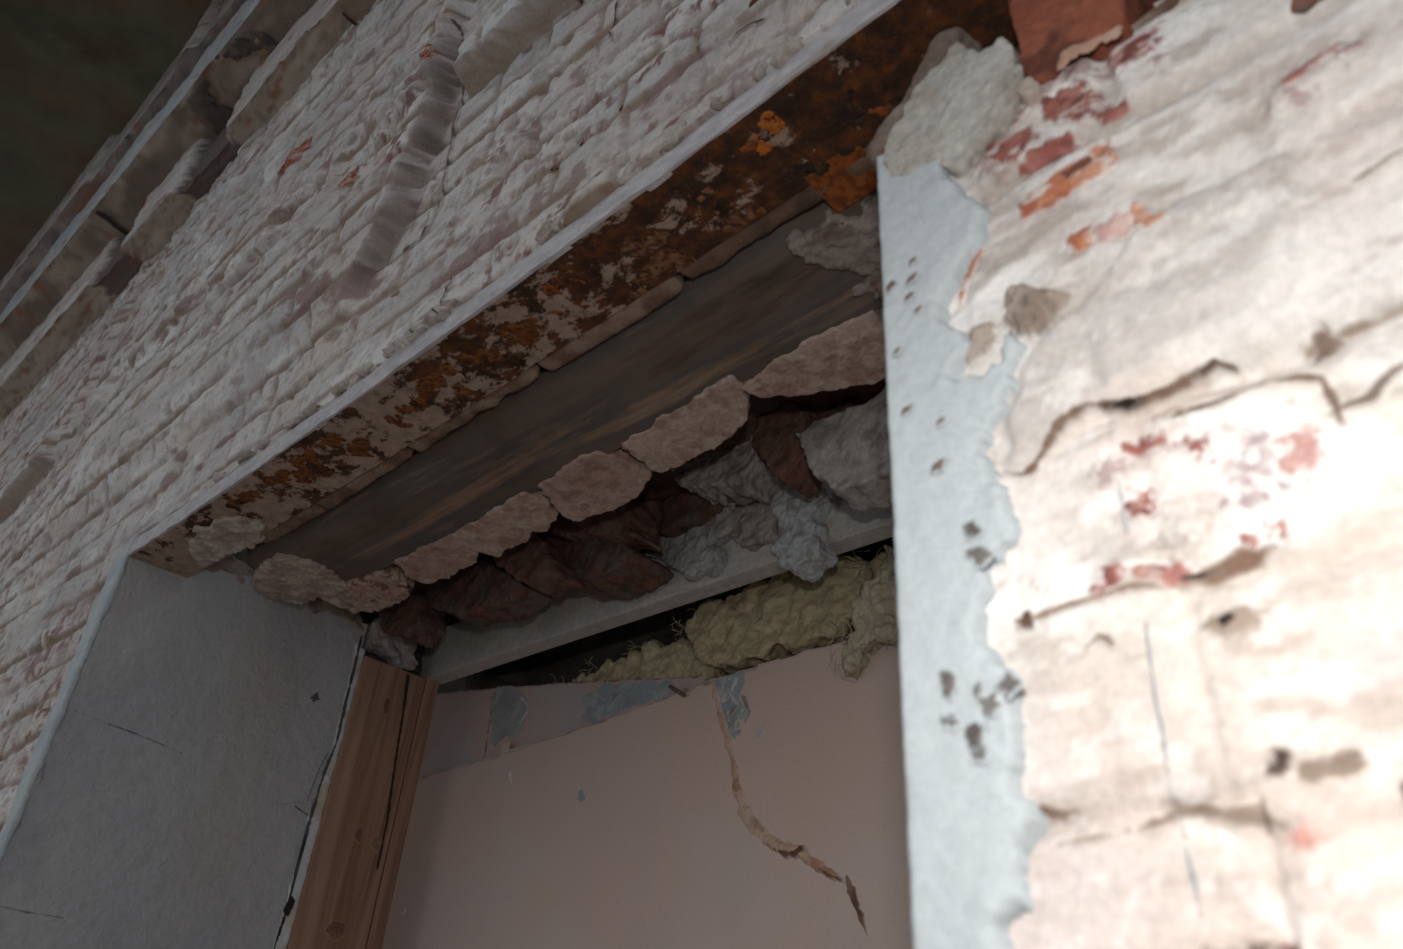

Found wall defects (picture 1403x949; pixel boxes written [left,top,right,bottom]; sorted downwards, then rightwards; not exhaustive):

rust [740,110,785,156]
rust [781,83,912,213]
peeling [968,17,1174,224]
rust [620,229,696,302]
spalling [1065,198,1172,256]
rust [383,277,590,429]
rust [223,433,375,512]
spalling [961,517,996,571]
peeling [1083,419,1341,606]
spalling [938,668,1025,766]
crack [711,678,868,937]
spalling [1291,742,1390,791]